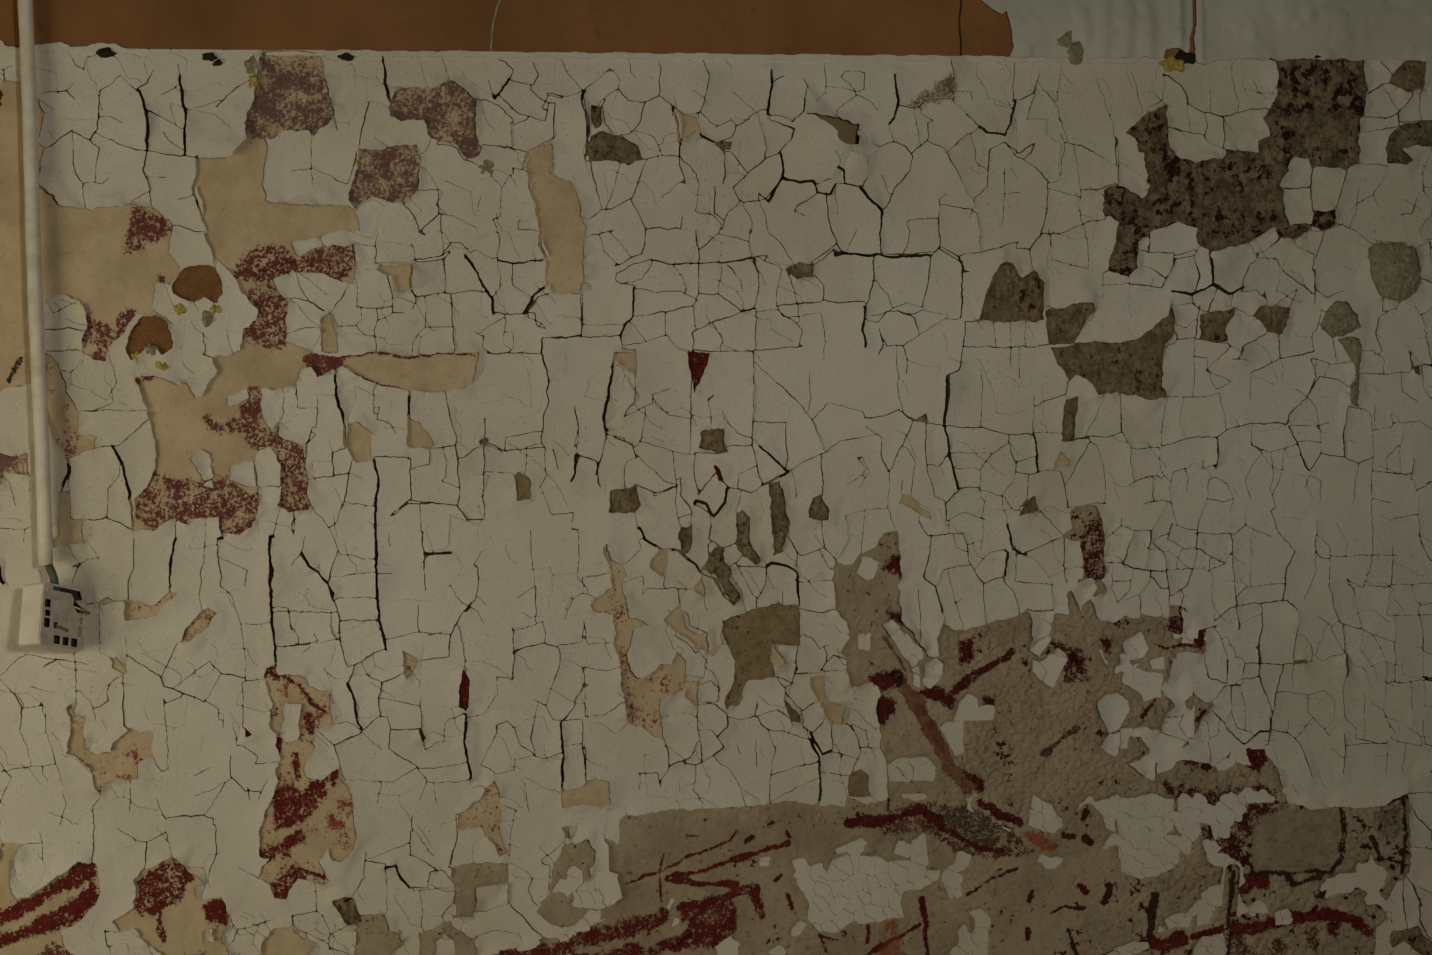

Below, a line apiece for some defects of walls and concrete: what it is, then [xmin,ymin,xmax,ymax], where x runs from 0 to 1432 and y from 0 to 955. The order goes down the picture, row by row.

crack [45,53,239,232]
crack [481,0,592,151]
peeling [1030,58,1279,198]
spalling [974,262,1044,325]
spalling [1051,306,1177,400]
spalling [1100,59,1432,489]
crack [71,438,134,593]
crack [117,57,1432,872]
peeling [273,607,298,646]
crack [0,603,128,825]
peeling [0,674,357,955]
crack [359,819,458,927]